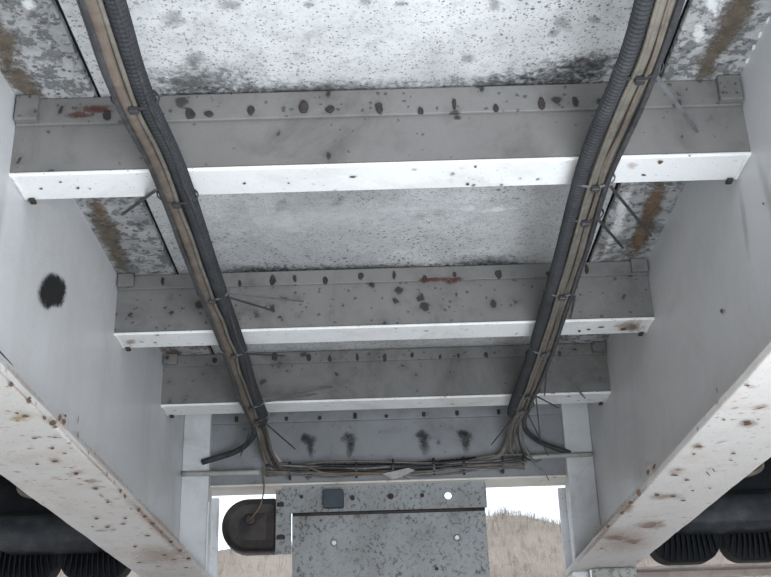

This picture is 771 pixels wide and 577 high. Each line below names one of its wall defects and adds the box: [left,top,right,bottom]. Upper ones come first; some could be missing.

rust [0,22,41,96]
damp [162,69,231,95]
damp [245,84,370,93]
mould [477,58,607,87]
rust [695,0,754,78]
rust [89,199,128,270]
rust [630,182,663,257]